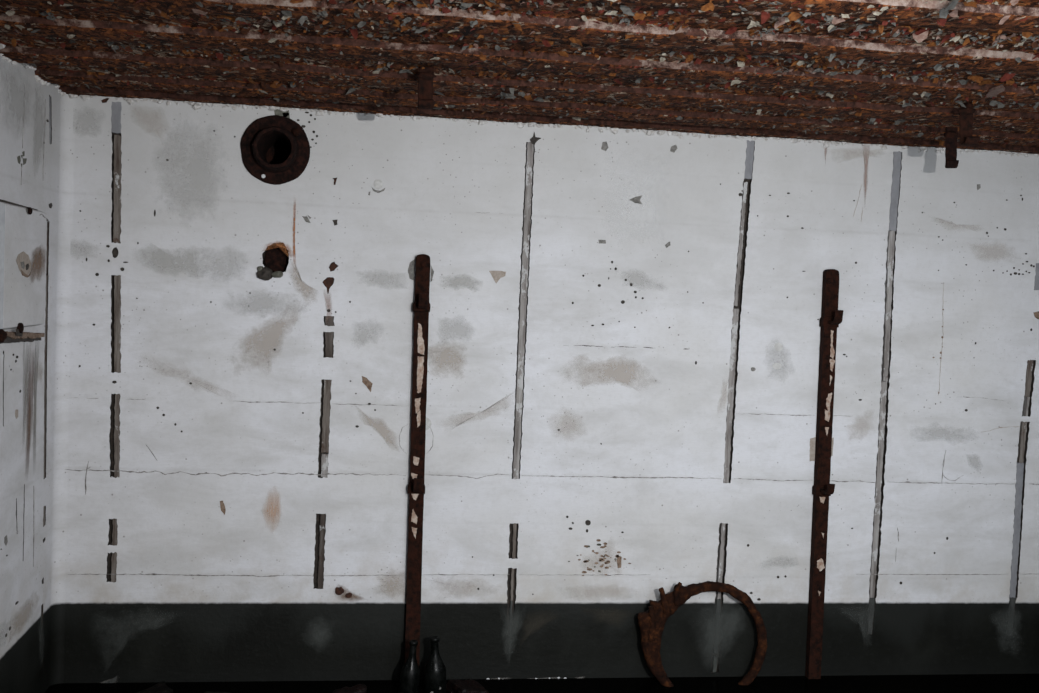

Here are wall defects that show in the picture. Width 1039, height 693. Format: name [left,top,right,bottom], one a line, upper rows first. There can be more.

peeling [0,0,1039,148]